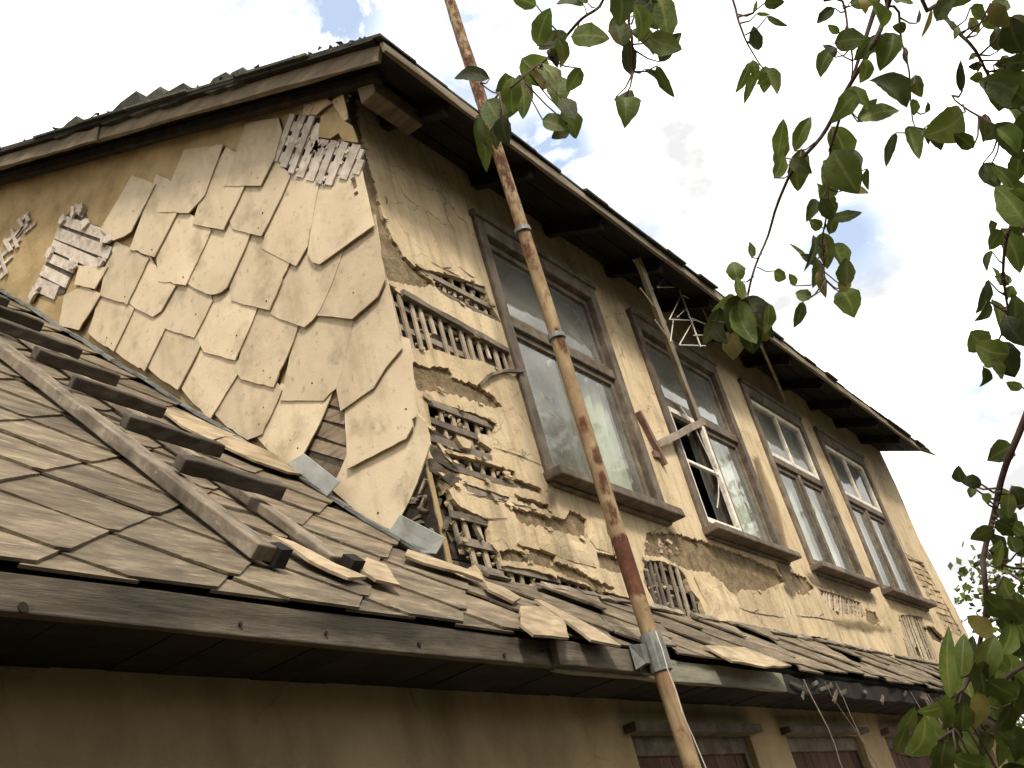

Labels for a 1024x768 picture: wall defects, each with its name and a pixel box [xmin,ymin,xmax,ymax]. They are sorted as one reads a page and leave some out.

peeling [303,94,370,150]
peeling [58,203,90,231]
flaking render [350,164,452,288]
flaking render [413,364,498,408]
flaking render [427,425,461,496]
flaking render [644,529,834,596]
flaking render [907,557,962,643]